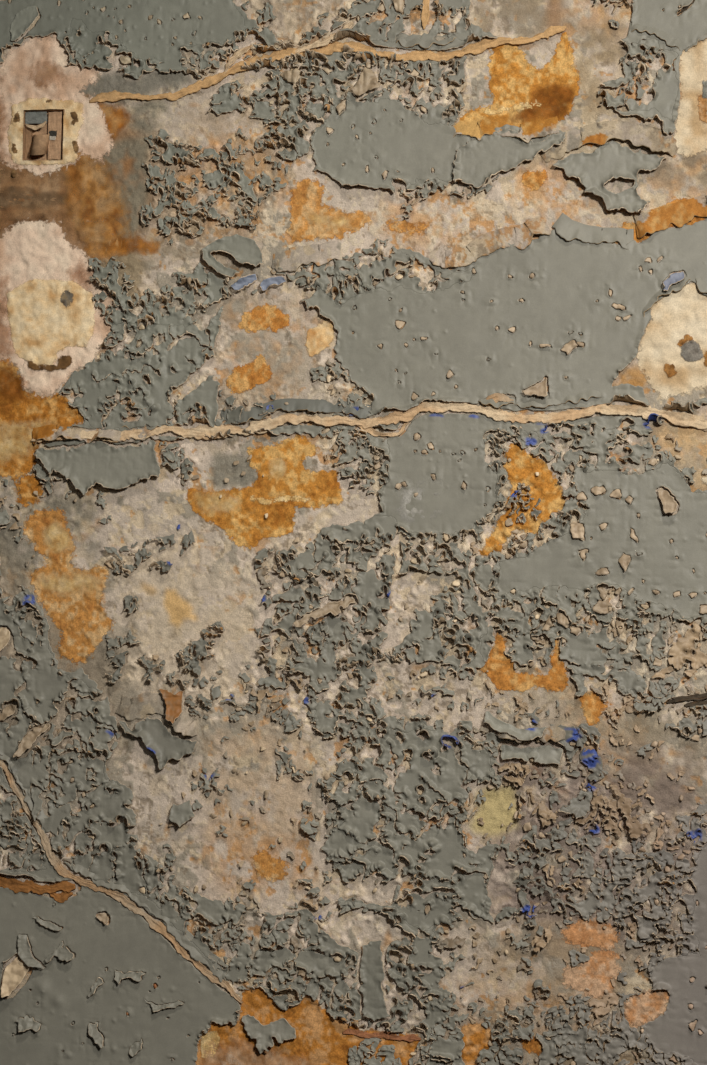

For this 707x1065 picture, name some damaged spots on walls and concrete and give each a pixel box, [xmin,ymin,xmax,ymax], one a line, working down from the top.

crack [89,0,567,103]
corrosion [460,32,580,124]
corrosion [285,178,372,243]
peeling [0,0,707,524]
crack [31,393,707,443]
corrosion [0,358,116,665]
corrosion [186,434,344,549]
corrosion [478,443,566,556]
corrosion [480,633,569,692]
peeling [0,419,707,1065]
crack [0,759,243,1004]
corrosion [196,987,420,1065]